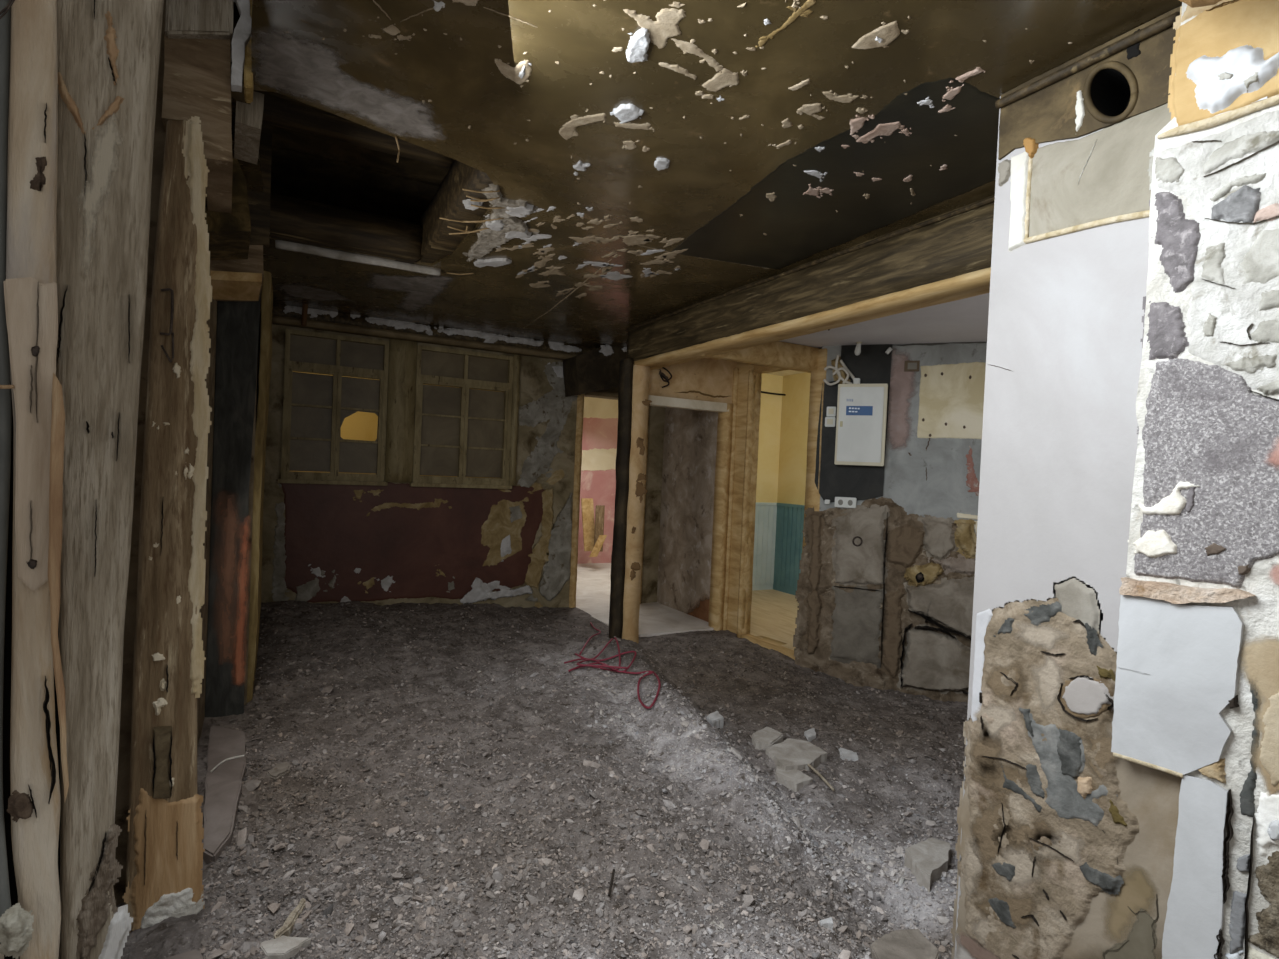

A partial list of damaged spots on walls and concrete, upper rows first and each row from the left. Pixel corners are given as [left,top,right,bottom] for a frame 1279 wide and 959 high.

leakage [253,28,443,138]
peeling [611,2,747,102]
peeling [768,90,912,149]
flaking render [852,21,909,49]
peeling [463,199,688,298]
flaking render [998,90,1279,588]
peeling [271,305,582,608]
peeling [917,362,986,496]
corrosion [215,493,249,685]
crack [835,512,971,686]
flaking render [793,497,1182,959]
crack [1057,667,1149,722]